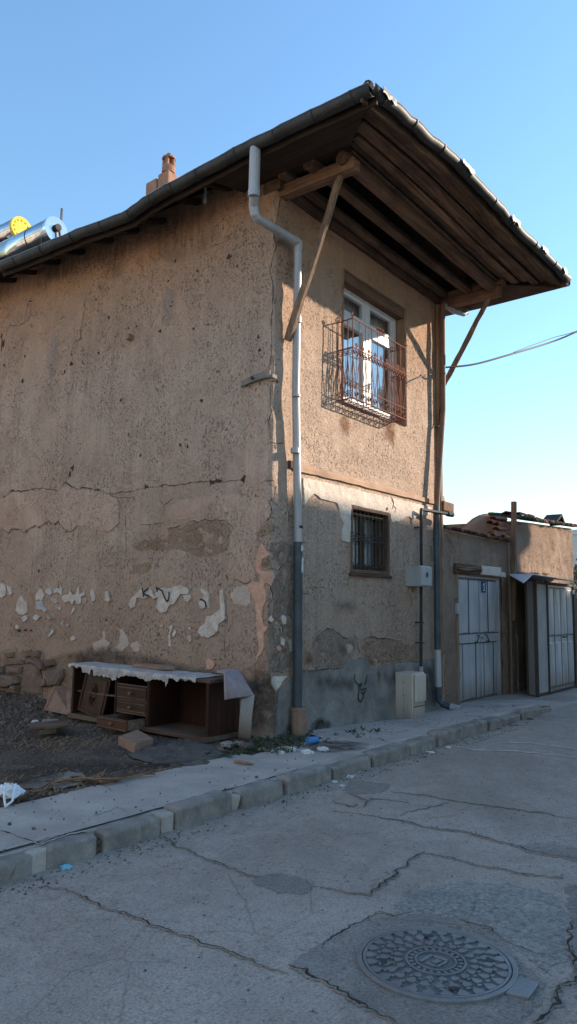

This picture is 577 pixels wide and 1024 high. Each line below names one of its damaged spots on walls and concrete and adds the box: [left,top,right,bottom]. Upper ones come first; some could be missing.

crack [4,475,240,556]
flaking render [302,478,432,543]
spalling [0,583,141,703]
flaking render [129,521,293,691]
crack [163,836,256,877]
crack [320,791,577,945]
crack [45,886,397,1023]